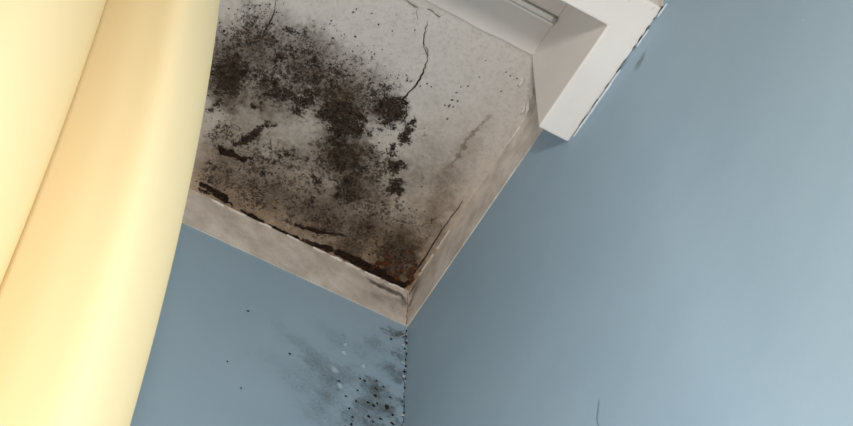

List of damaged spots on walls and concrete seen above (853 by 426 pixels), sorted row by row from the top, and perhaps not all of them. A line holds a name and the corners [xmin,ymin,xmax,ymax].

crack [374,0,441,125]
leakage [196,2,433,301]
leakage [344,377,395,426]